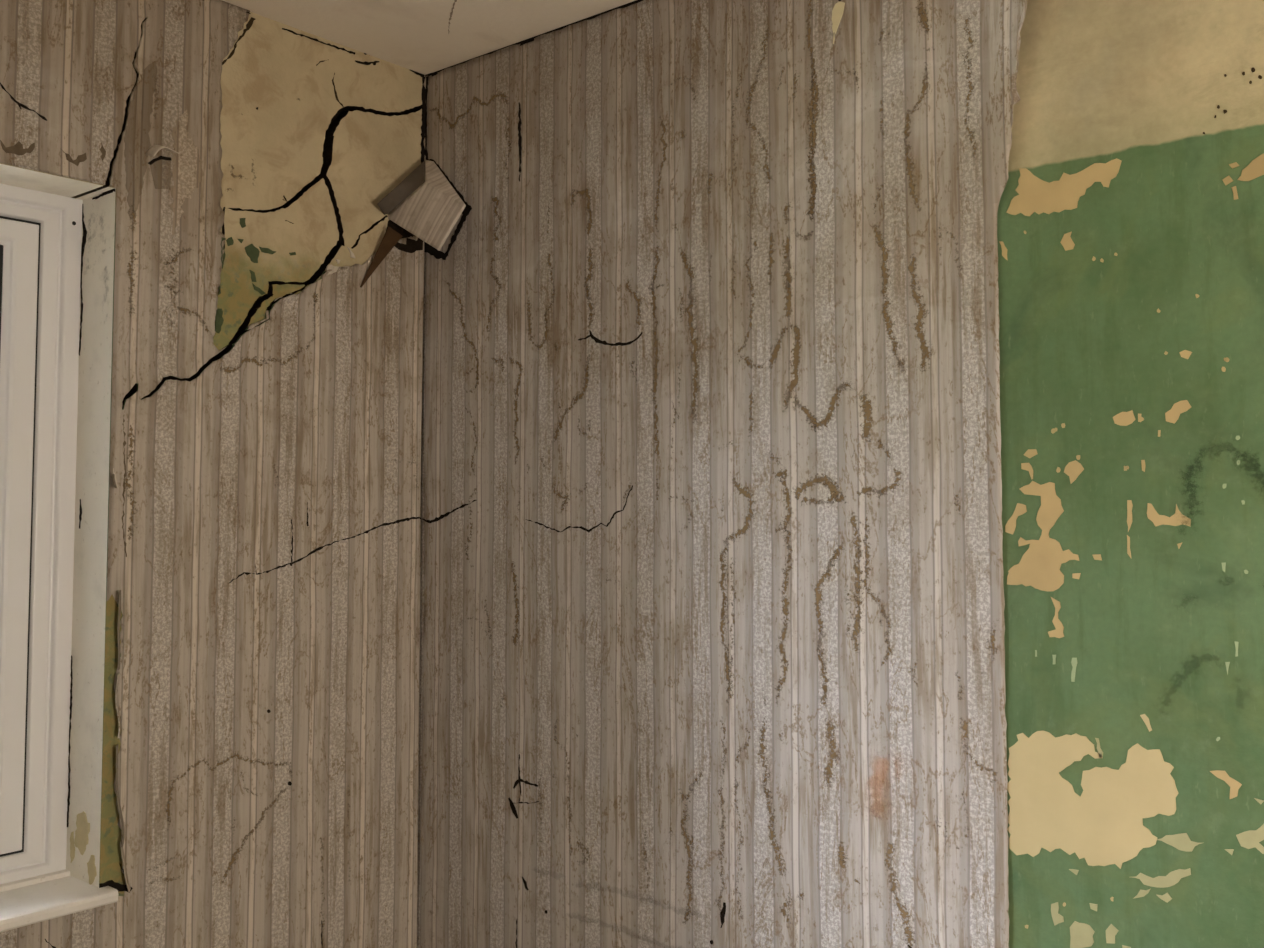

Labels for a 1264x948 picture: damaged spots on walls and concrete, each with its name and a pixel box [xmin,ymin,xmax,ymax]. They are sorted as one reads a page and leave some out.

flaking render [213,12,425,350]
peeling [1006,158,1122,216]
crack [113,0,643,557]
water stain [626,117,700,461]
water stain [908,254,932,371]
crack [229,500,477,583]
water stain [716,0,905,919]
peeling [1005,449,1102,638]
peeling [1127,500,1191,558]
water stain [670,773,702,924]
water stain [884,842,915,947]
peeling [1007,731,1202,875]